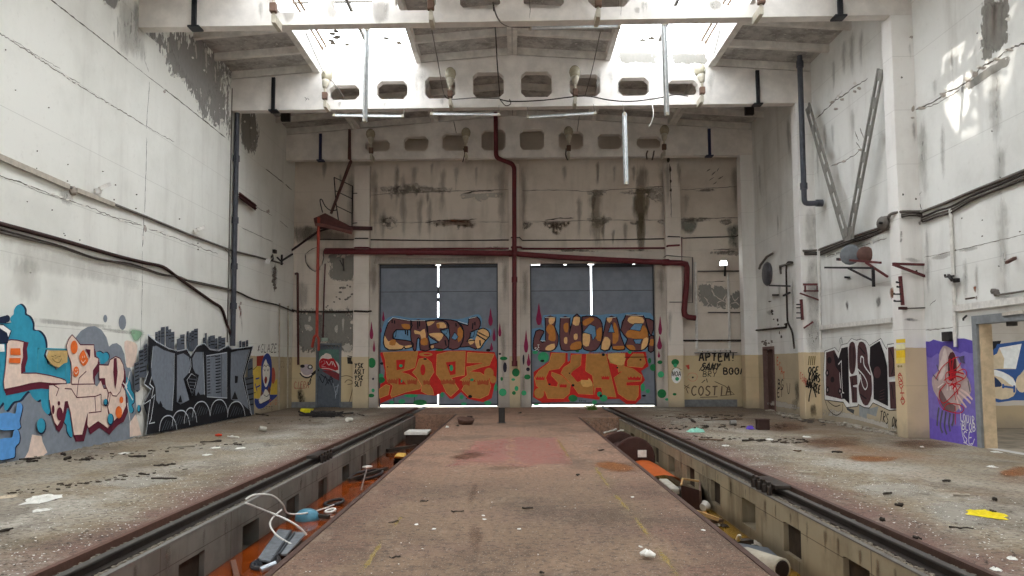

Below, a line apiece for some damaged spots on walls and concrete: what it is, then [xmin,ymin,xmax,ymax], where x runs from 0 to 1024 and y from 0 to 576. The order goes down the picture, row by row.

peeling [975,0,1010,60]
peeling [146,32,259,154]
crack [916,43,1024,110]
crack [0,0,225,286]
peeling [698,281,740,309]